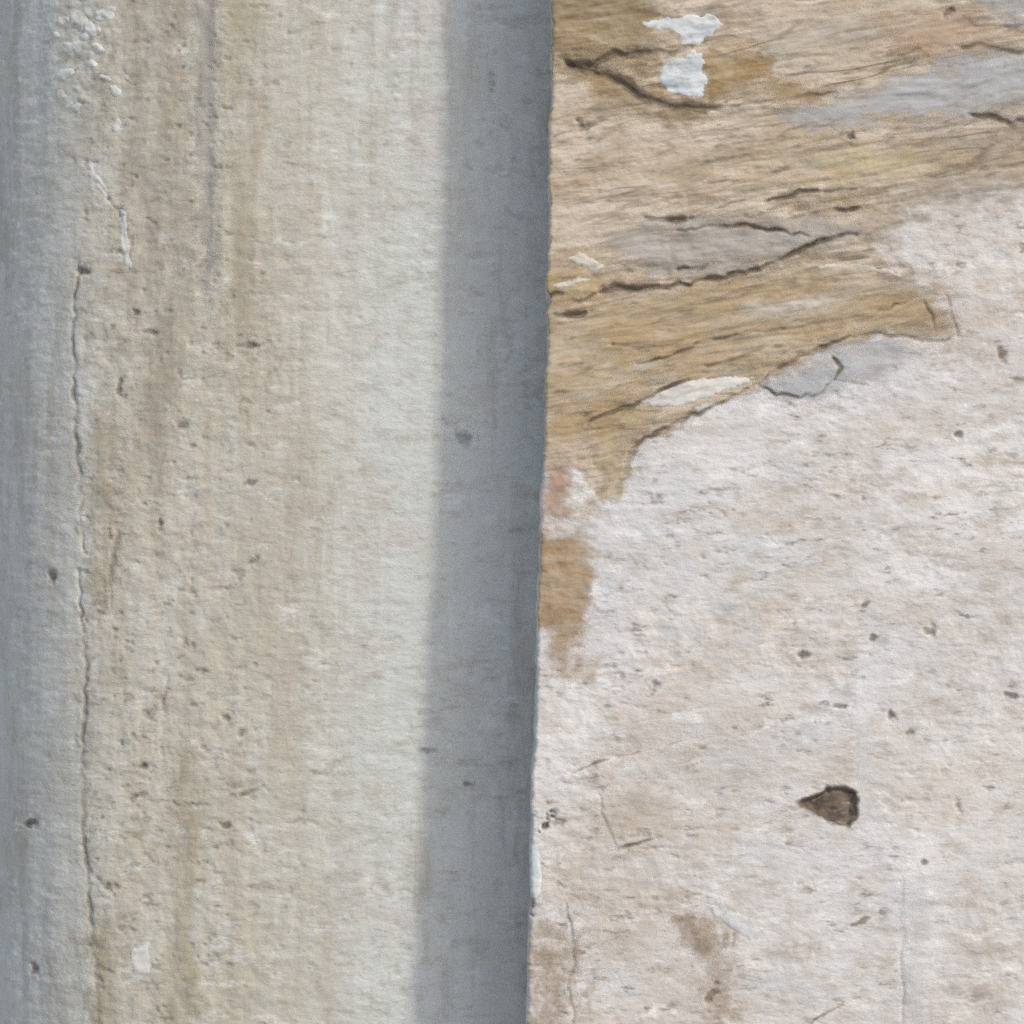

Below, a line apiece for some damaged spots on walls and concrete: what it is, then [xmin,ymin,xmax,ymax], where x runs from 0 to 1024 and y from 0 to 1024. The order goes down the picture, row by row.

crack [565,48,674,103]
crack [680,102,704,112]
crack [550,188,859,318]
flaking render [542,0,1024,495]
spalling [798,786,859,827]